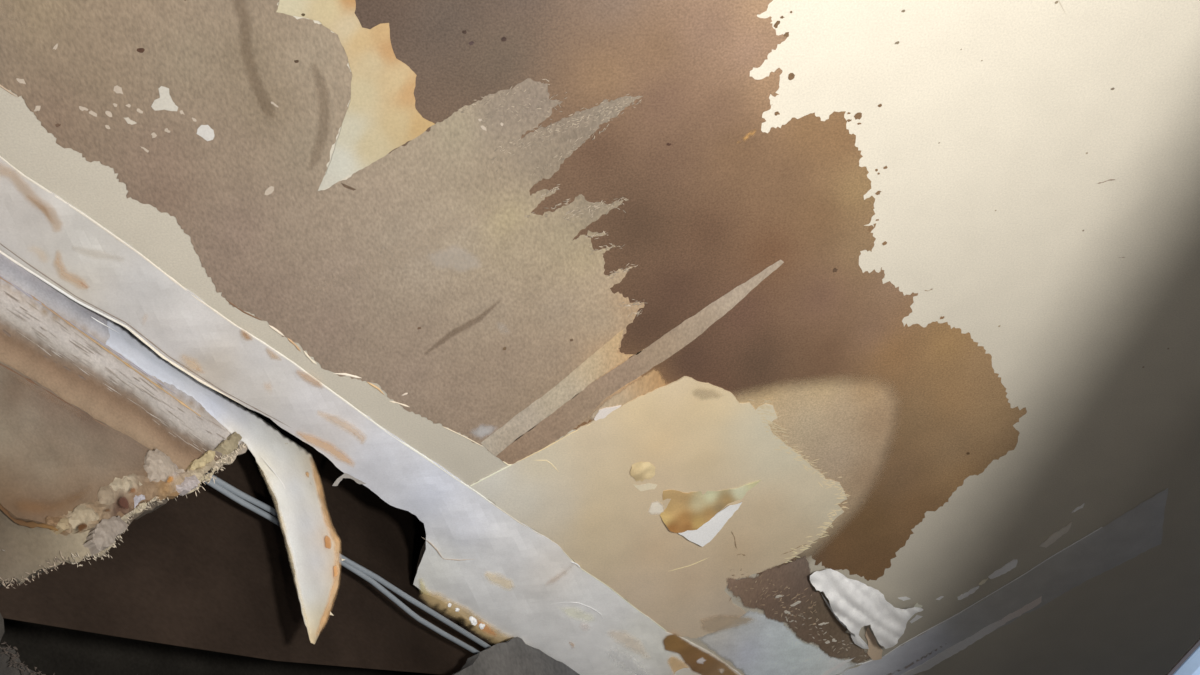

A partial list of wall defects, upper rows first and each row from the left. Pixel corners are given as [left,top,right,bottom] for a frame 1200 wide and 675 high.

damp [105,488,135,511]
peeling [0,0,645,466]
damp [355,0,1027,581]
peeling [727,556,870,663]